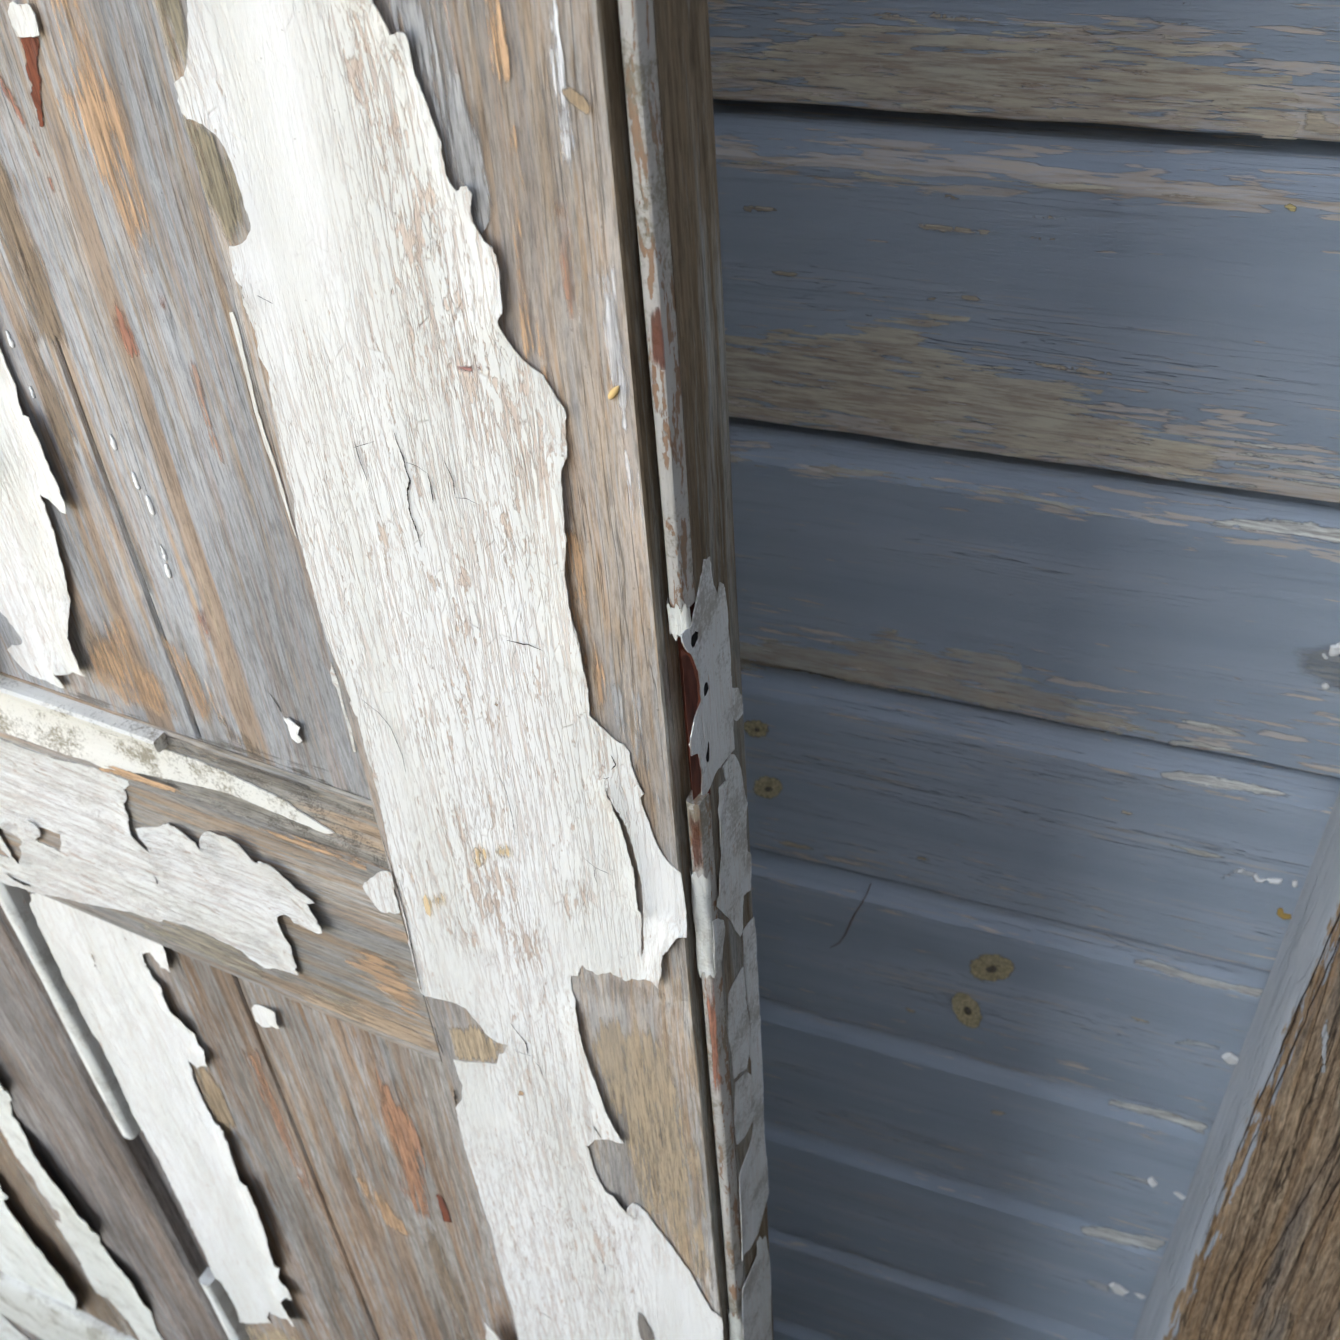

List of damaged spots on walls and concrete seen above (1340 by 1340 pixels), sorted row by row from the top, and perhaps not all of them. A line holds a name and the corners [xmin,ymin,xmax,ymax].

rust [20,37,44,127]
peeling [0,331,85,688]
peeling [131,471,155,515]
peeling [160,544,172,578]
peeling [174,0,772,1340]
peeling [0,696,335,1340]